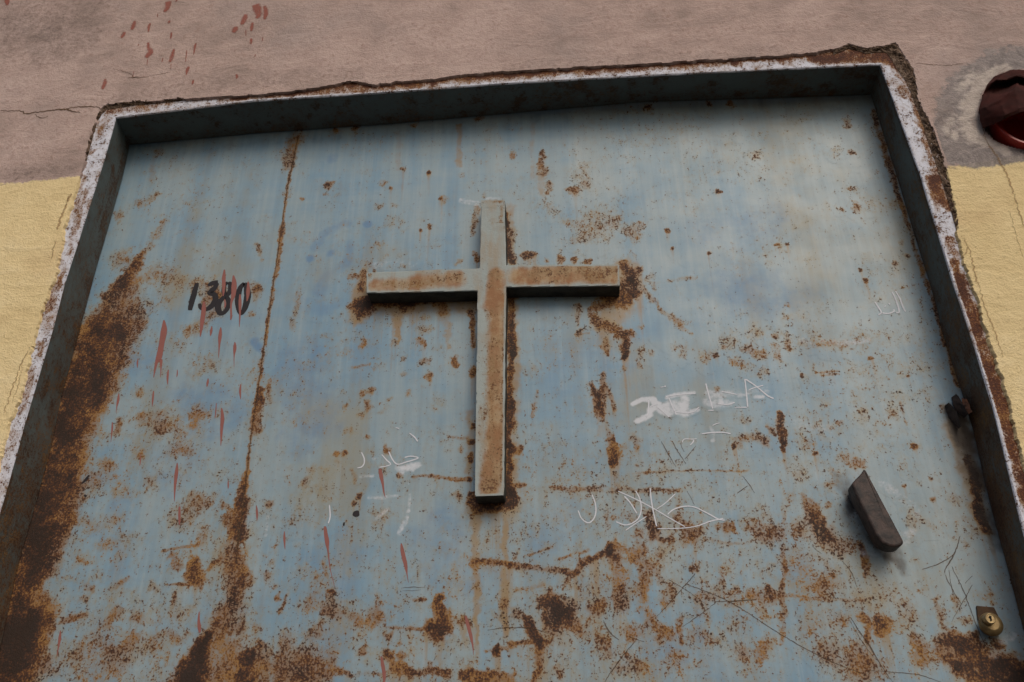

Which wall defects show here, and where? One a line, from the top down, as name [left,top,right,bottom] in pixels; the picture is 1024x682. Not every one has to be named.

crack [1,106,101,118]
corrosion [0,130,526,682]
corrosion [87,49,1024,524]
corrosion [337,146,1024,682]